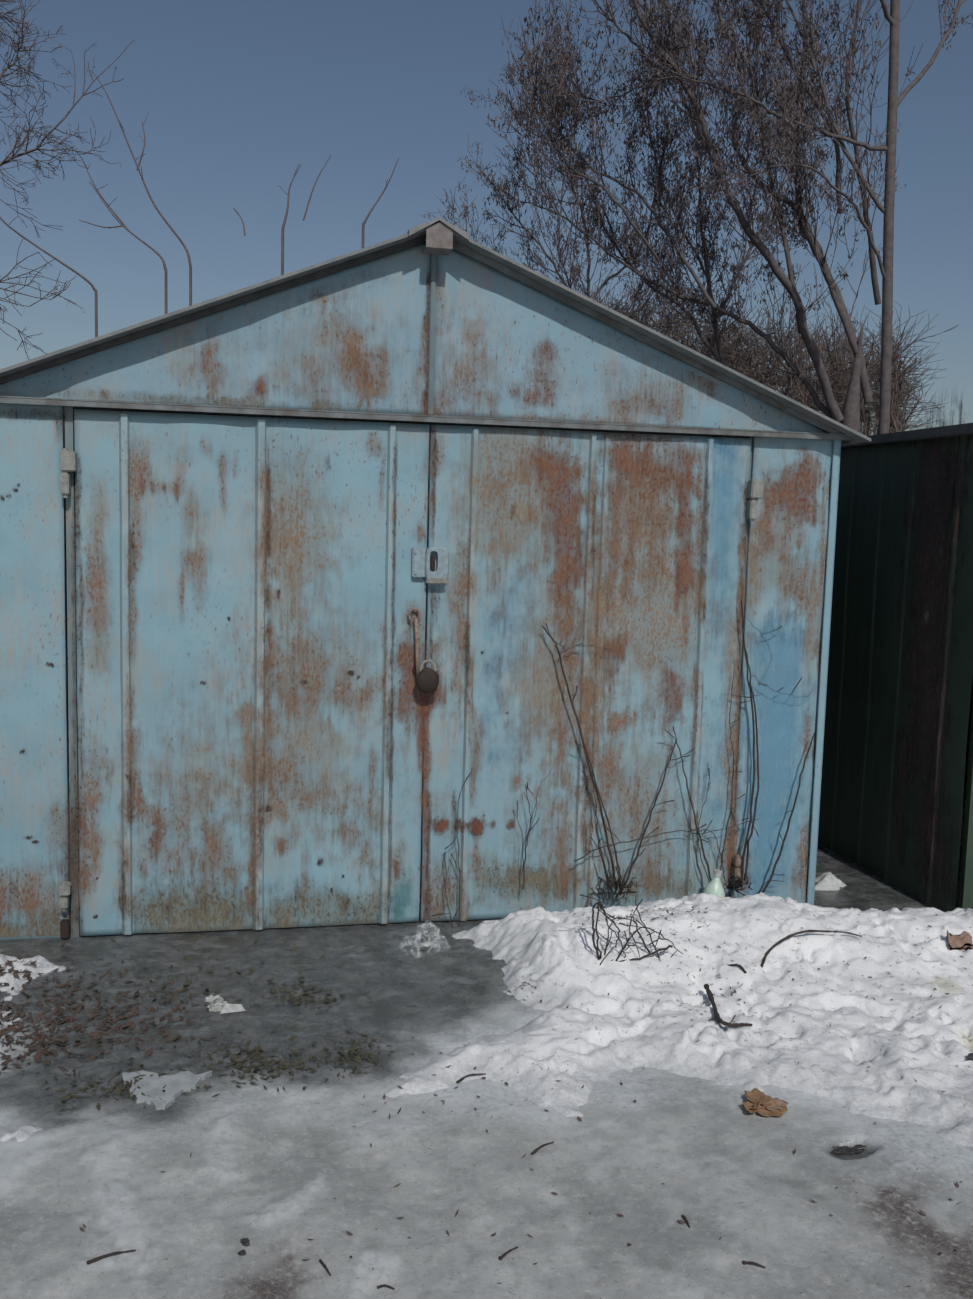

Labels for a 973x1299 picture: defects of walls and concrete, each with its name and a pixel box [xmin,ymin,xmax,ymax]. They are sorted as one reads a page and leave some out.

rust [275,293,387,403]
rust [0,749,108,931]
rust [87,490,105,668]
rust [118,446,381,922]
rust [397,269,709,921]
rust [720,449,827,883]